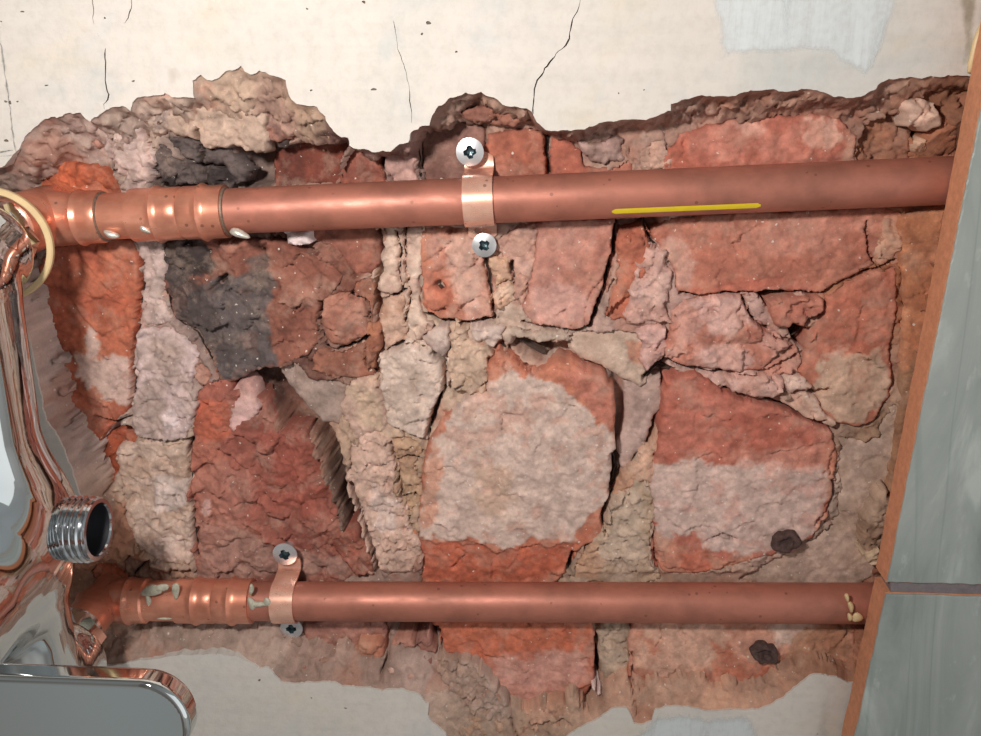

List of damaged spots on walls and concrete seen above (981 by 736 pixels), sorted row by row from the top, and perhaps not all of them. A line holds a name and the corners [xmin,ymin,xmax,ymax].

crack [393,21,412,120]
crack [532,3,580,113]
spalling [0,66,970,197]
spalling [23,205,945,606]
spalling [102,621,865,736]